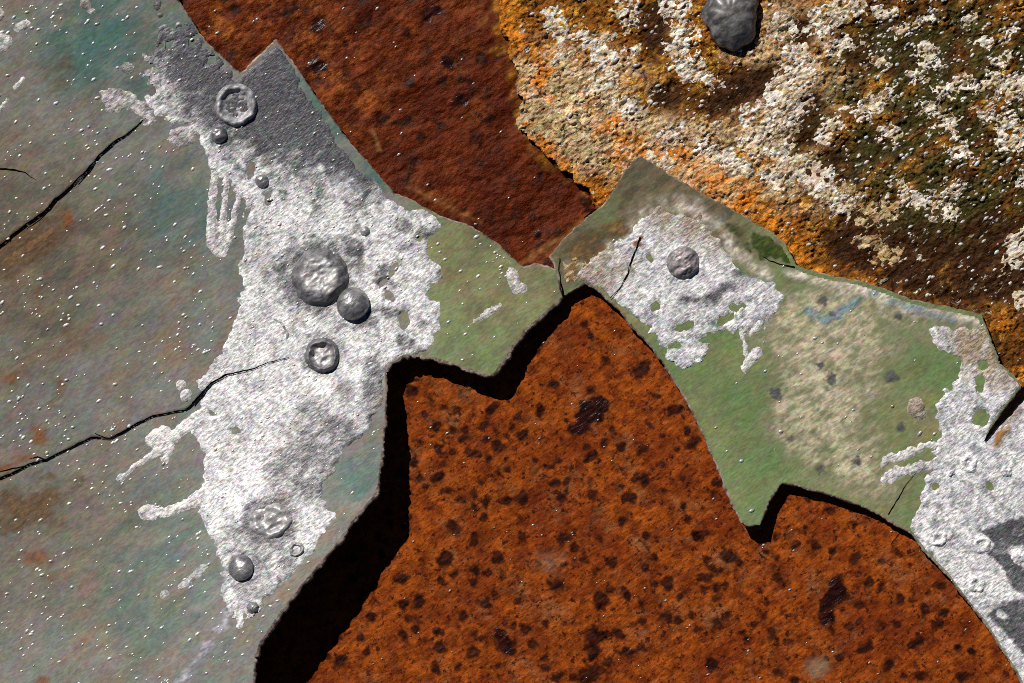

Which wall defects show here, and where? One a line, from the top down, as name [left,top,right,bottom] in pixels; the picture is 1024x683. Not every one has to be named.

crack [0,118,146,246]
crack [610,237,641,298]
leakage [607,197,981,499]
crack [0,357,289,479]
corrosion [560,386,649,463]
crack [984,387,1024,441]
corrosion [408,398,528,547]
corrosion [436,550,504,588]
corrosion [594,586,643,611]
corrosion [697,548,743,601]
corrosion [818,574,883,634]
corrosion [455,618,647,683]